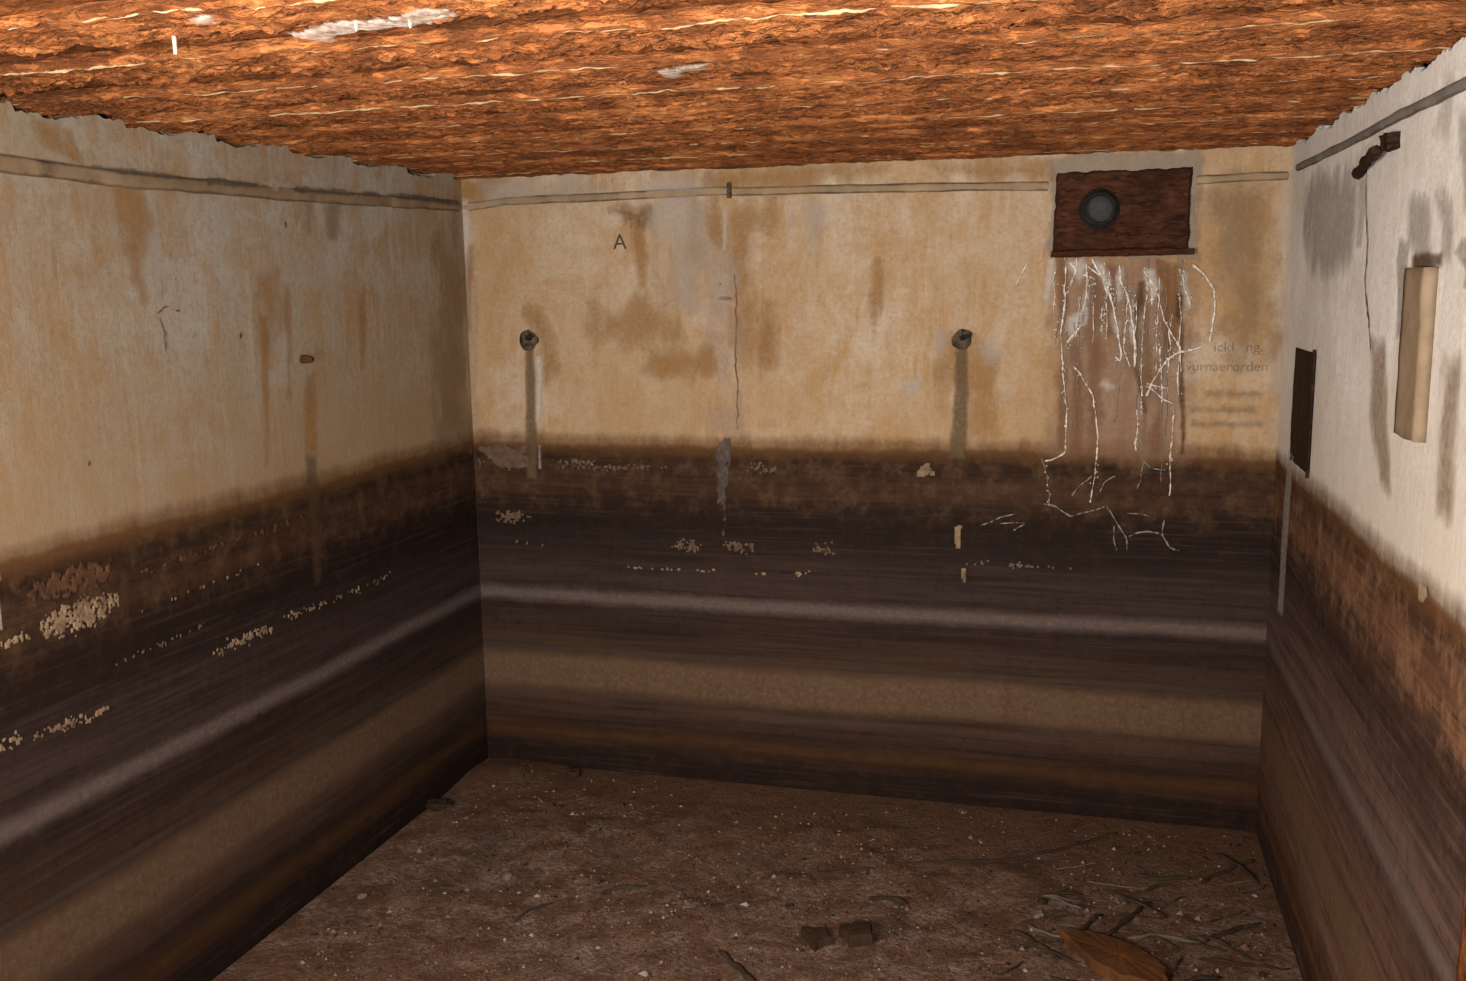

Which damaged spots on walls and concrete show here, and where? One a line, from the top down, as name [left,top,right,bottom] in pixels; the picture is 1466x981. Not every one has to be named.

damp [462,202,471,287]
damp [0,258,1466,981]